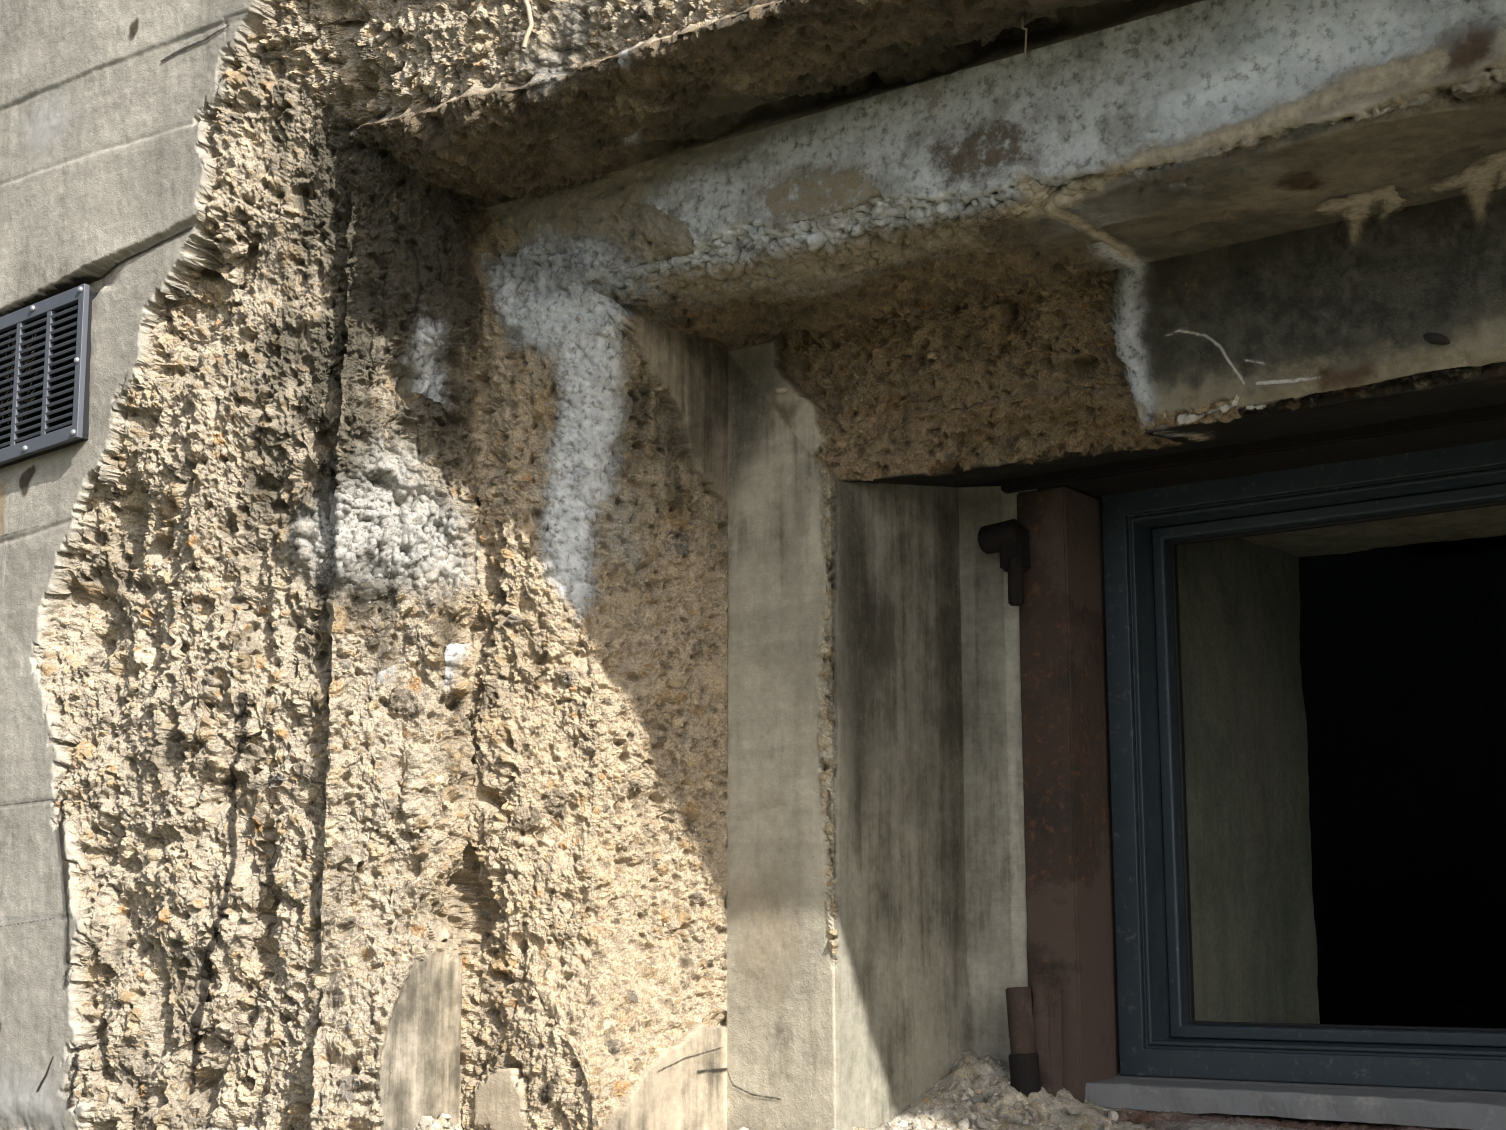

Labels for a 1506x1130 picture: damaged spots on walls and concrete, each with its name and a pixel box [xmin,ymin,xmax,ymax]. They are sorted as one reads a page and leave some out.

crack [1,799,72,986]
crack [190,692,251,1094]
spalling [35,0,1071,1130]
spalling [612,234,1240,964]
leakage [483,0,1506,614]